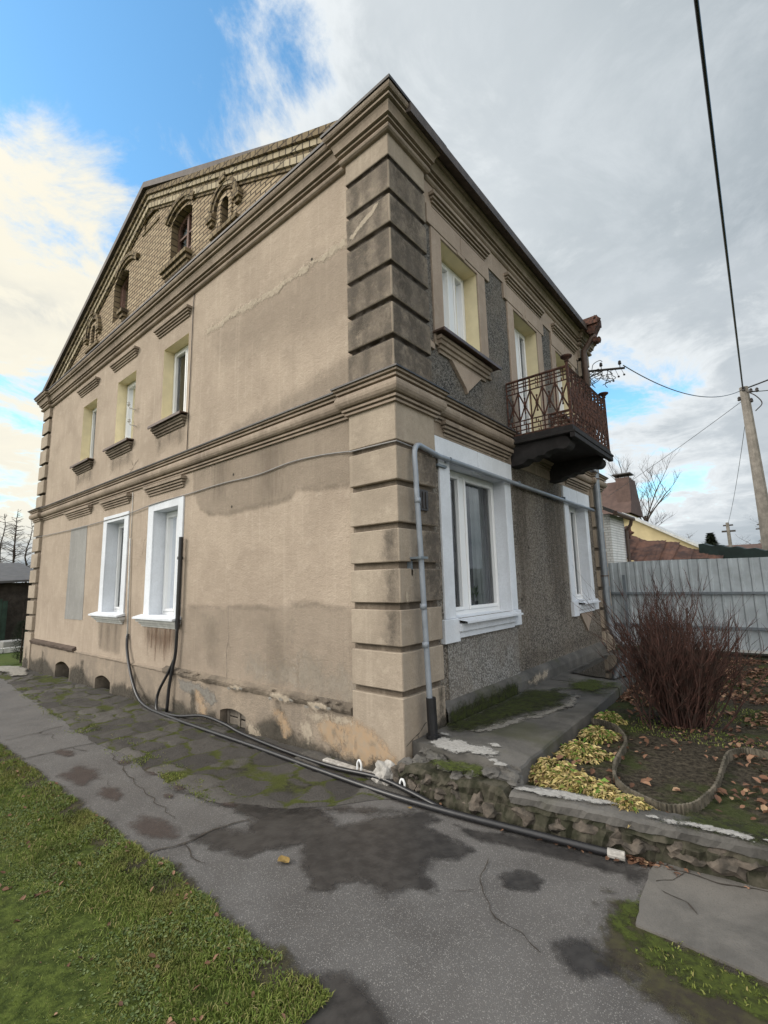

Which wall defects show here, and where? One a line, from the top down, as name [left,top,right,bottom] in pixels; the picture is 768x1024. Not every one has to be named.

flaking render [195,690,206,715]
flaking render [268,693,397,766]
crack [144,819,249,863]
leakage [190,802,645,893]
crack [460,860,541,953]